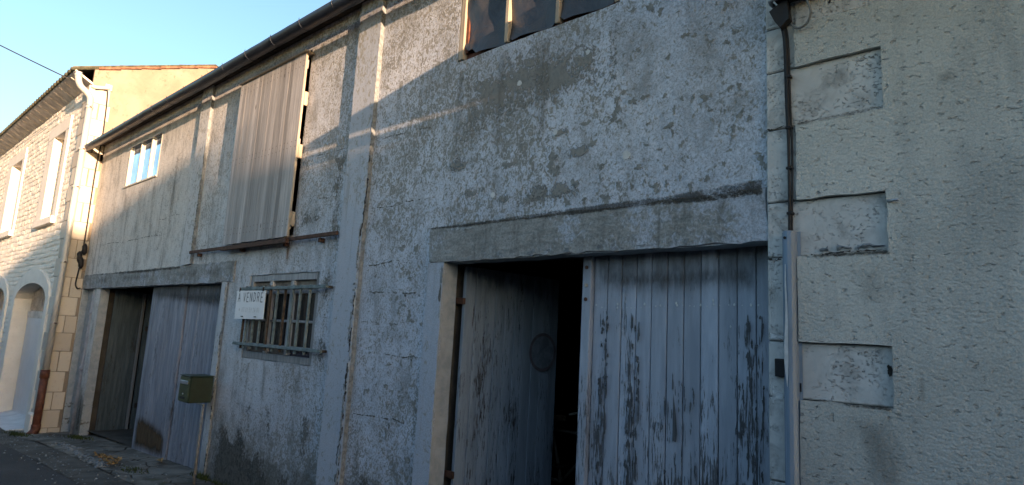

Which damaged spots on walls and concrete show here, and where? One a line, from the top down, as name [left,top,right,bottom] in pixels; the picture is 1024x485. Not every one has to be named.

leakage [460,20,619,142]
crack [313,122,443,485]
peeling [595,311,609,485]
peeling [623,313,640,485]
peeling [658,374,696,485]